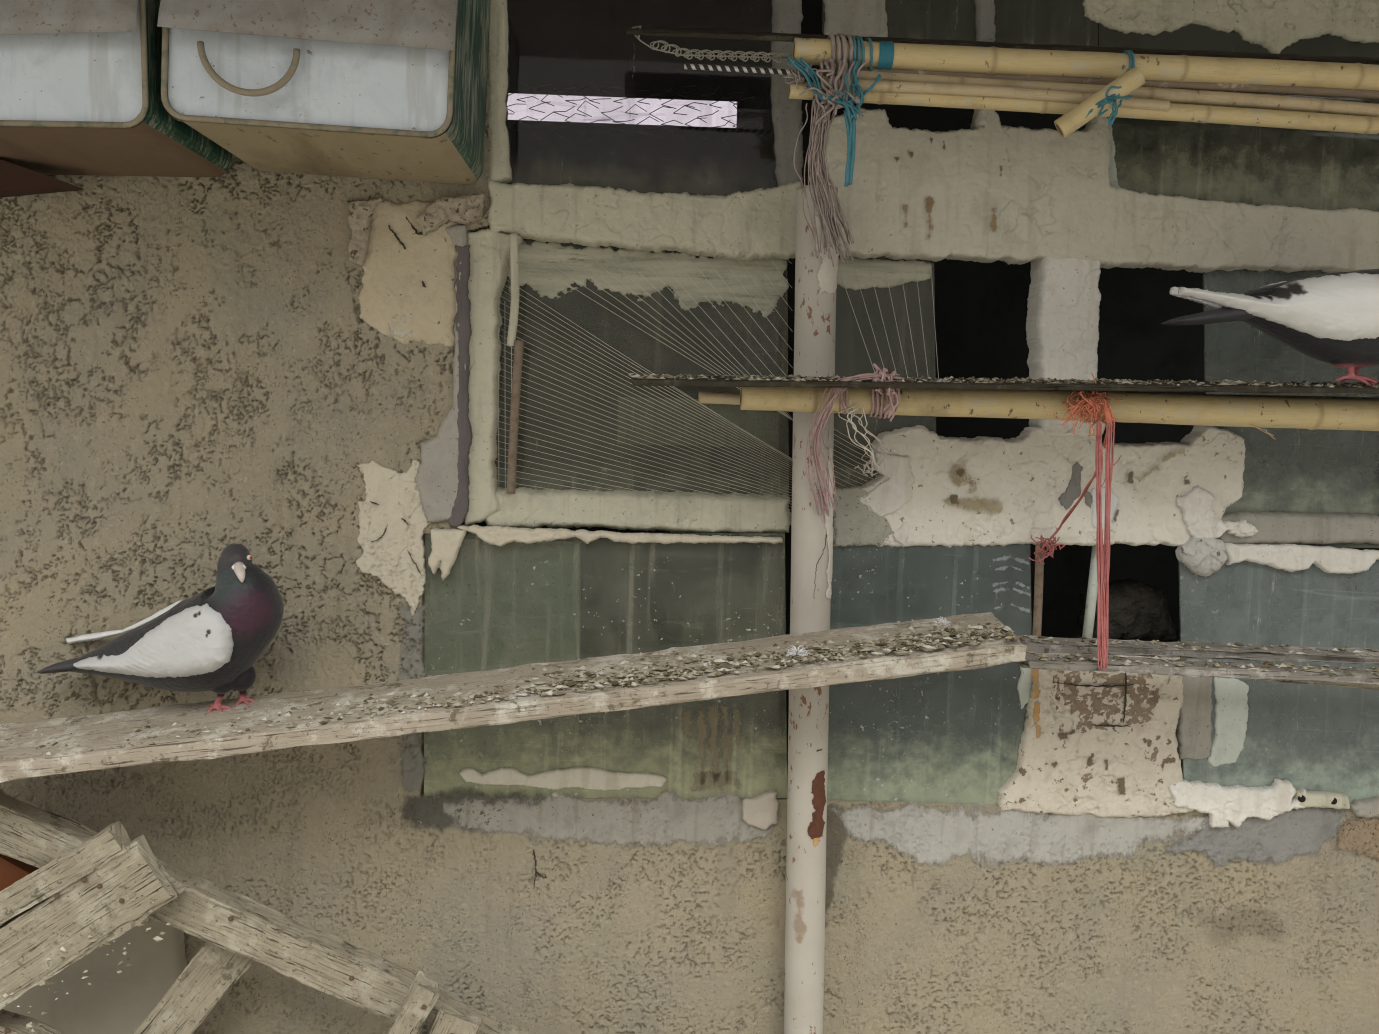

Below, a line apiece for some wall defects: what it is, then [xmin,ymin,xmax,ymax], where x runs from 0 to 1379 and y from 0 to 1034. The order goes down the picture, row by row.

peeling [356,460,783,616]
spalling [824,431,915,599]
corrosion [807,770,826,846]
damp [1087,757,1126,795]
spalling [1337,817,1379,861]